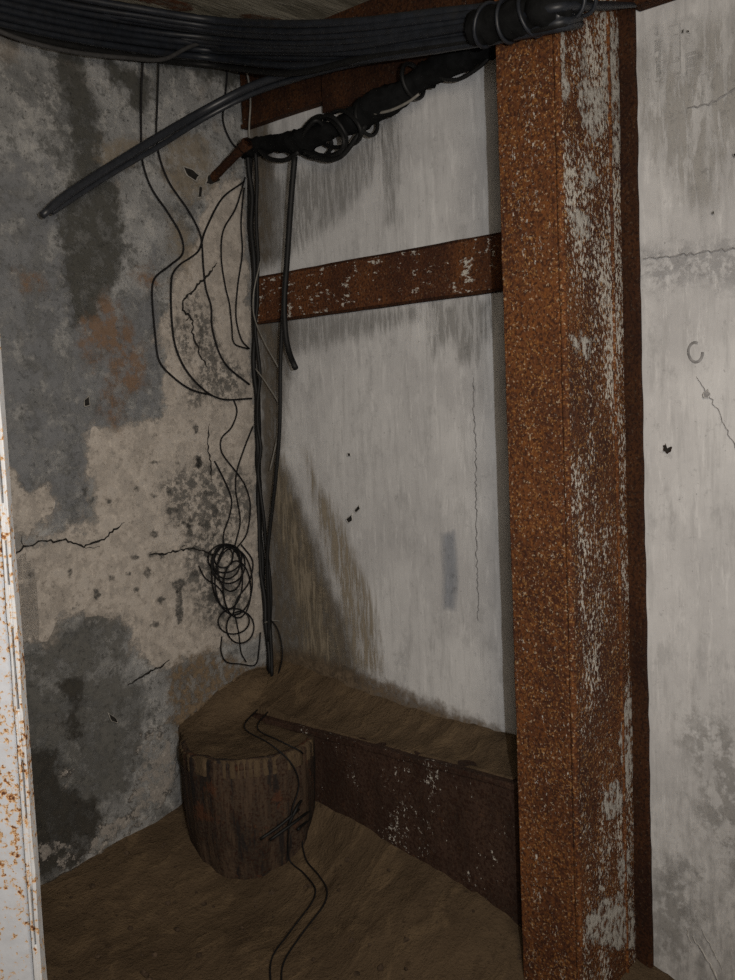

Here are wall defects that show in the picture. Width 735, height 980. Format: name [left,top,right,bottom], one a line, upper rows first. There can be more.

water stain [44,51,139,188]
water stain [104,59,151,113]
water stain [57,181,124,327]
water stain [250,117,393,264]
crack [16,522,125,554]
water stain [24,298,501,883]
water stain [699,729,735,824]